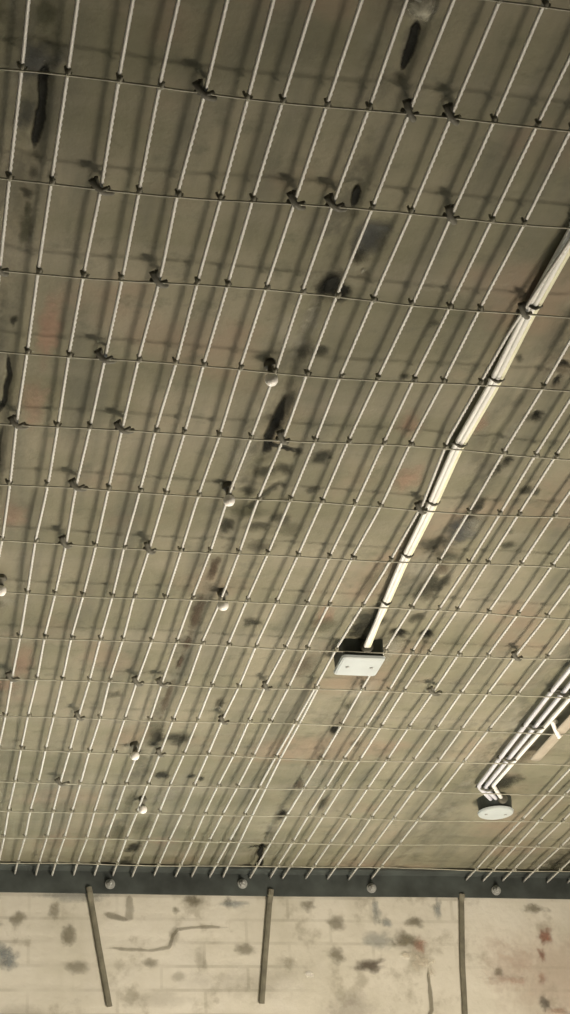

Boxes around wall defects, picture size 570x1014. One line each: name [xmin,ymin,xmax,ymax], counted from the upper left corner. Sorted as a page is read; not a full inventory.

crack [426,974,434,1014]